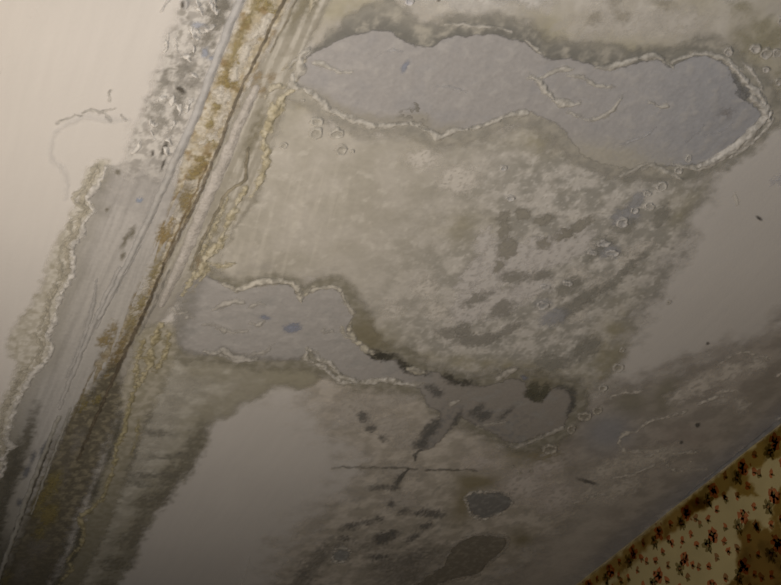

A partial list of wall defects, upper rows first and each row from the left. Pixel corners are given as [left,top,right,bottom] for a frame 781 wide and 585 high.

peeling [0,0,245,585]
rust [66,0,289,434]
damp [0,323,586,585]
peeling [172,271,588,452]
damp [137,0,719,395]
peeling [288,0,781,181]
damp [393,0,781,102]
damp [487,330,781,585]